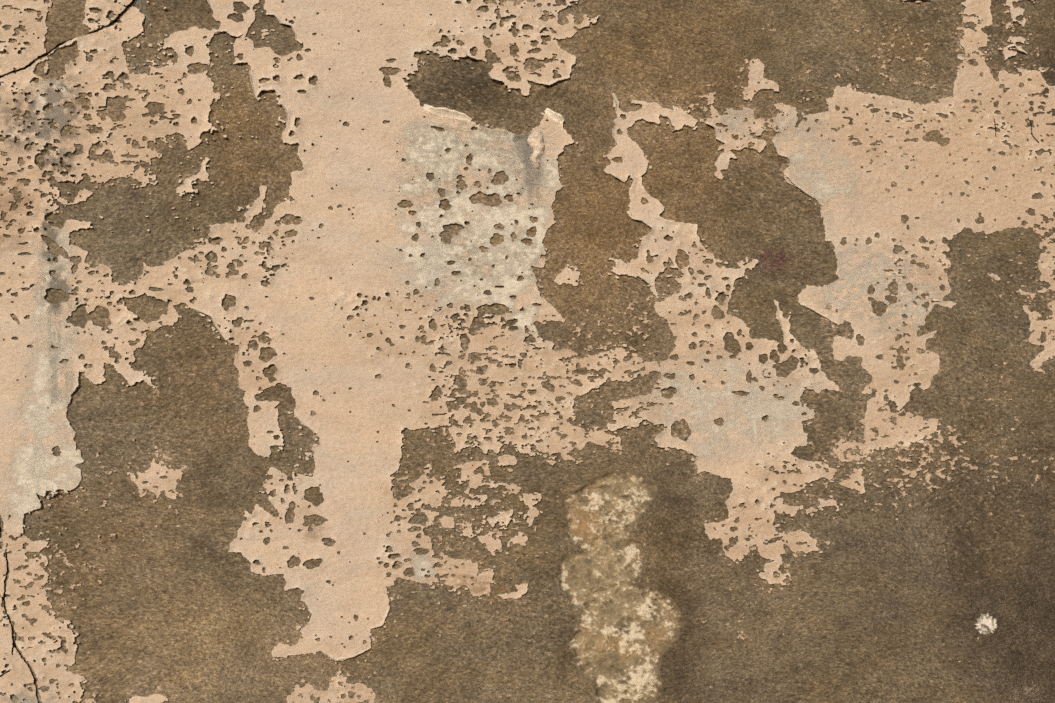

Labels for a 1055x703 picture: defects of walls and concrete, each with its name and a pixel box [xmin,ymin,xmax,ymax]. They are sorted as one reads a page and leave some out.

crack [0,0,137,78]
peeling [26,0,599,677]
peeling [370,0,1055,625]
crack [0,521,41,703]
peeling [129,694,168,703]
peeling [286,670,376,703]
spalling [555,468,686,703]